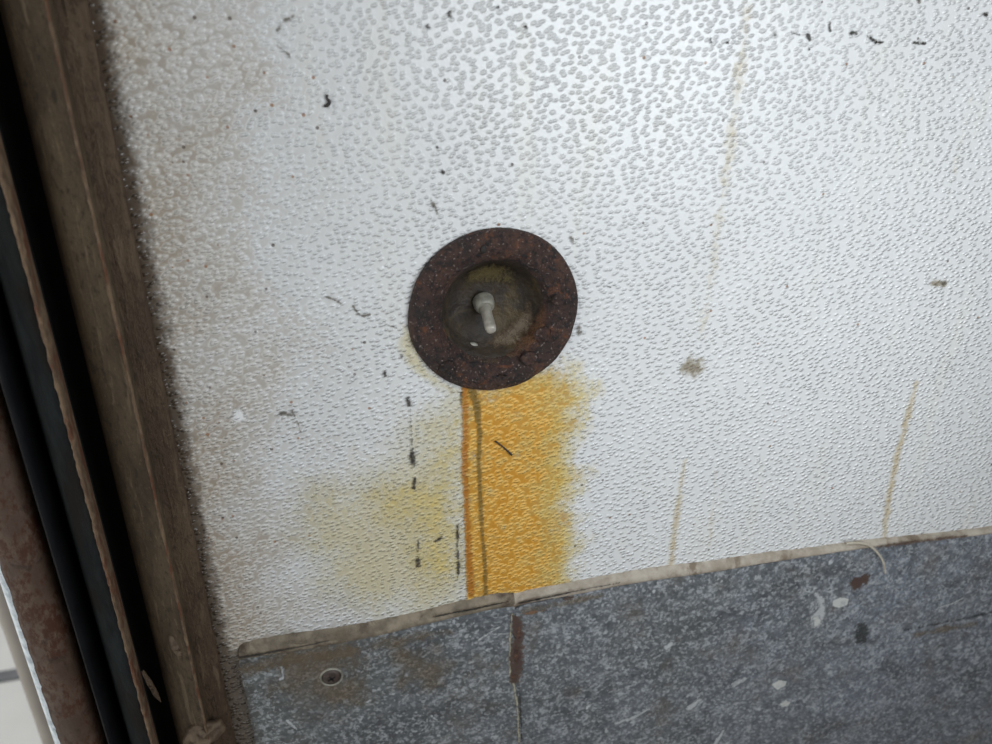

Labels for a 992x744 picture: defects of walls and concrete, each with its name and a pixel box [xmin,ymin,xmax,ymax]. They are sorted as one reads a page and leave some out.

corrosion [0,133,159,744]
corrosion [461,373,588,600]